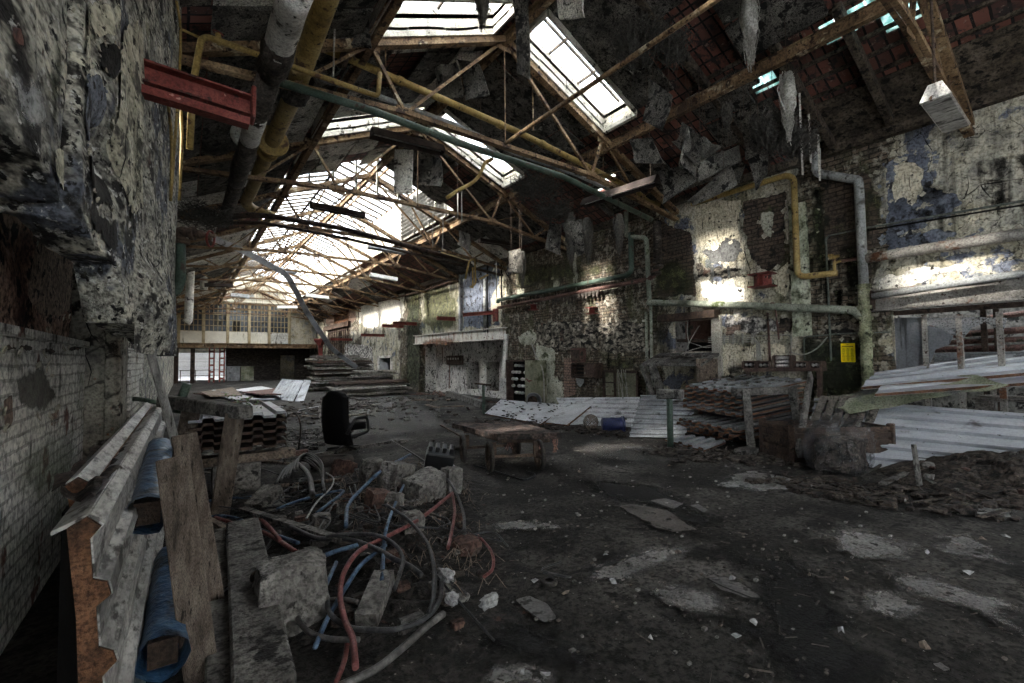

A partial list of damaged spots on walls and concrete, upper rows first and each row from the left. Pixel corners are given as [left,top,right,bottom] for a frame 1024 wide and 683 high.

water stain [18,71,58,125]
flaking render [656,190,793,377]
spalling [816,151,982,289]
spalling [518,319,649,404]